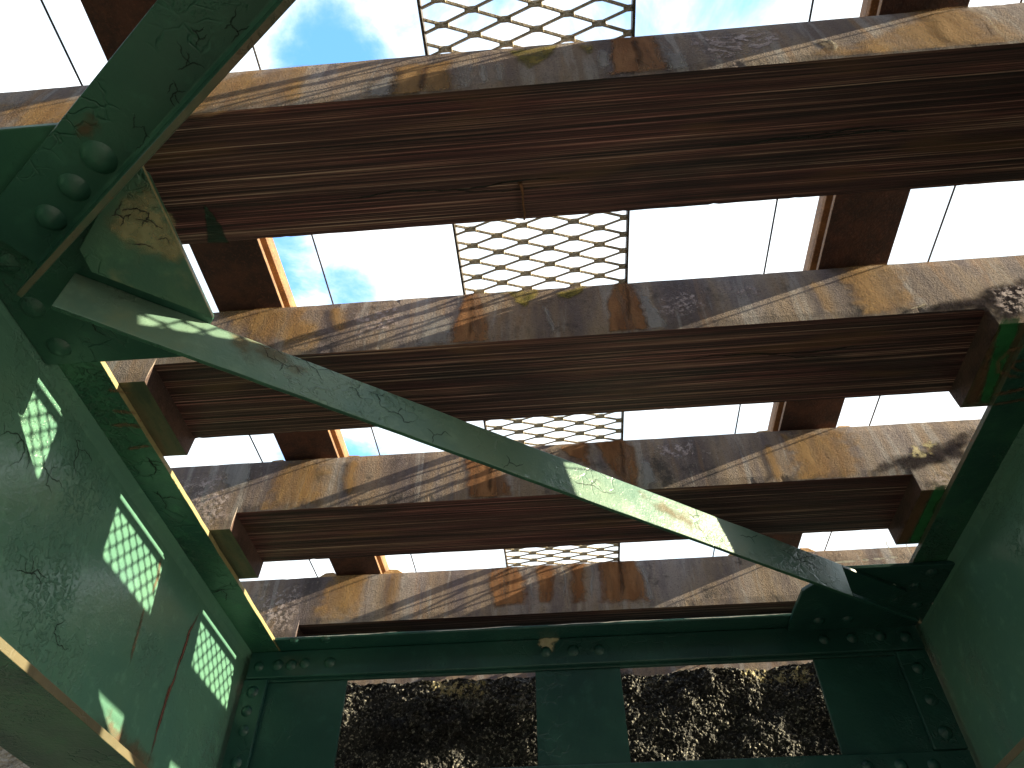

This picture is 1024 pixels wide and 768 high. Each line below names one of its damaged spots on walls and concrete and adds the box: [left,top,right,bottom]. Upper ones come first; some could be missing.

crack [167,7,249,105]
rust [611,36,667,74]
crack [112,201,171,260]
rust [451,293,488,343]
rust [607,283,648,331]
rust [490,567,526,606]
rust [536,565,555,602]
rust [571,560,648,602]
peeling [540,638,558,650]
rust [129,618,197,763]